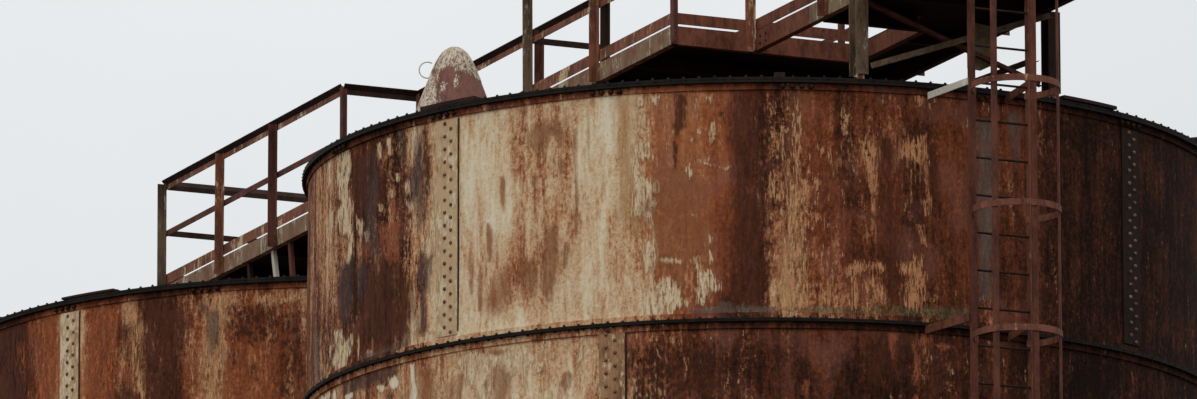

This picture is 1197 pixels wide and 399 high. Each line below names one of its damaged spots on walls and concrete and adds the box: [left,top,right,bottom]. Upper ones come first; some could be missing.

peeling [377,46,481,264]
peeling [327,149,369,265]
peeling [630,93,722,316]
peeling [768,96,932,314]
corrosion [469,224,566,311]
corrosion [17,315,58,399]
peeling [320,389,353,399]
peeling [329,327,373,370]
peeling [377,363,418,399]
peeling [406,290,442,346]
corrosion [888,333,897,359]
corrosion [913,334,950,399]